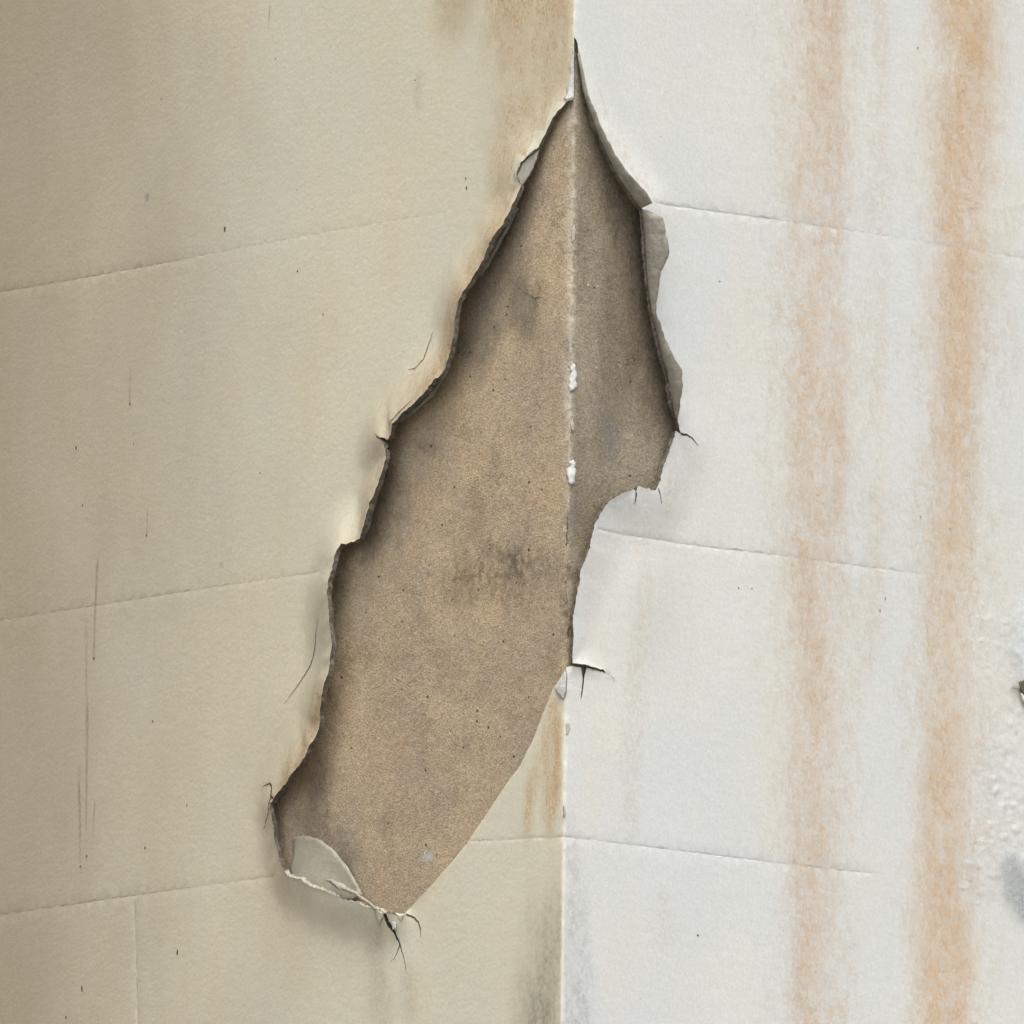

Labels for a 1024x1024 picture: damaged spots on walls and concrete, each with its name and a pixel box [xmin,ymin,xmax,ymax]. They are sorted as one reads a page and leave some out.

peeling [259,39,705,944]